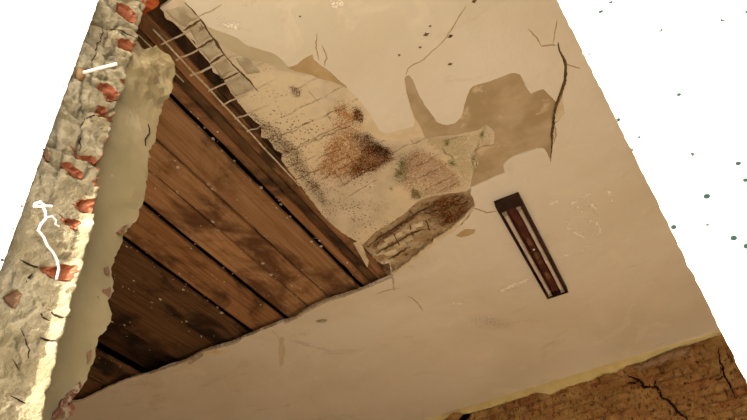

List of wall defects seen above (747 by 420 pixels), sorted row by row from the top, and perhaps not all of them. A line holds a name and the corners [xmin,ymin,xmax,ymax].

crack [405,6,466,75]
flaking render [95,79,125,122]
crack [528,21,580,157]
flaking render [60,136,109,188]
flaking render [115,0,564,374]
flaking render [61,198,97,230]
crack [627,375,688,420]
crack [716,350,735,398]